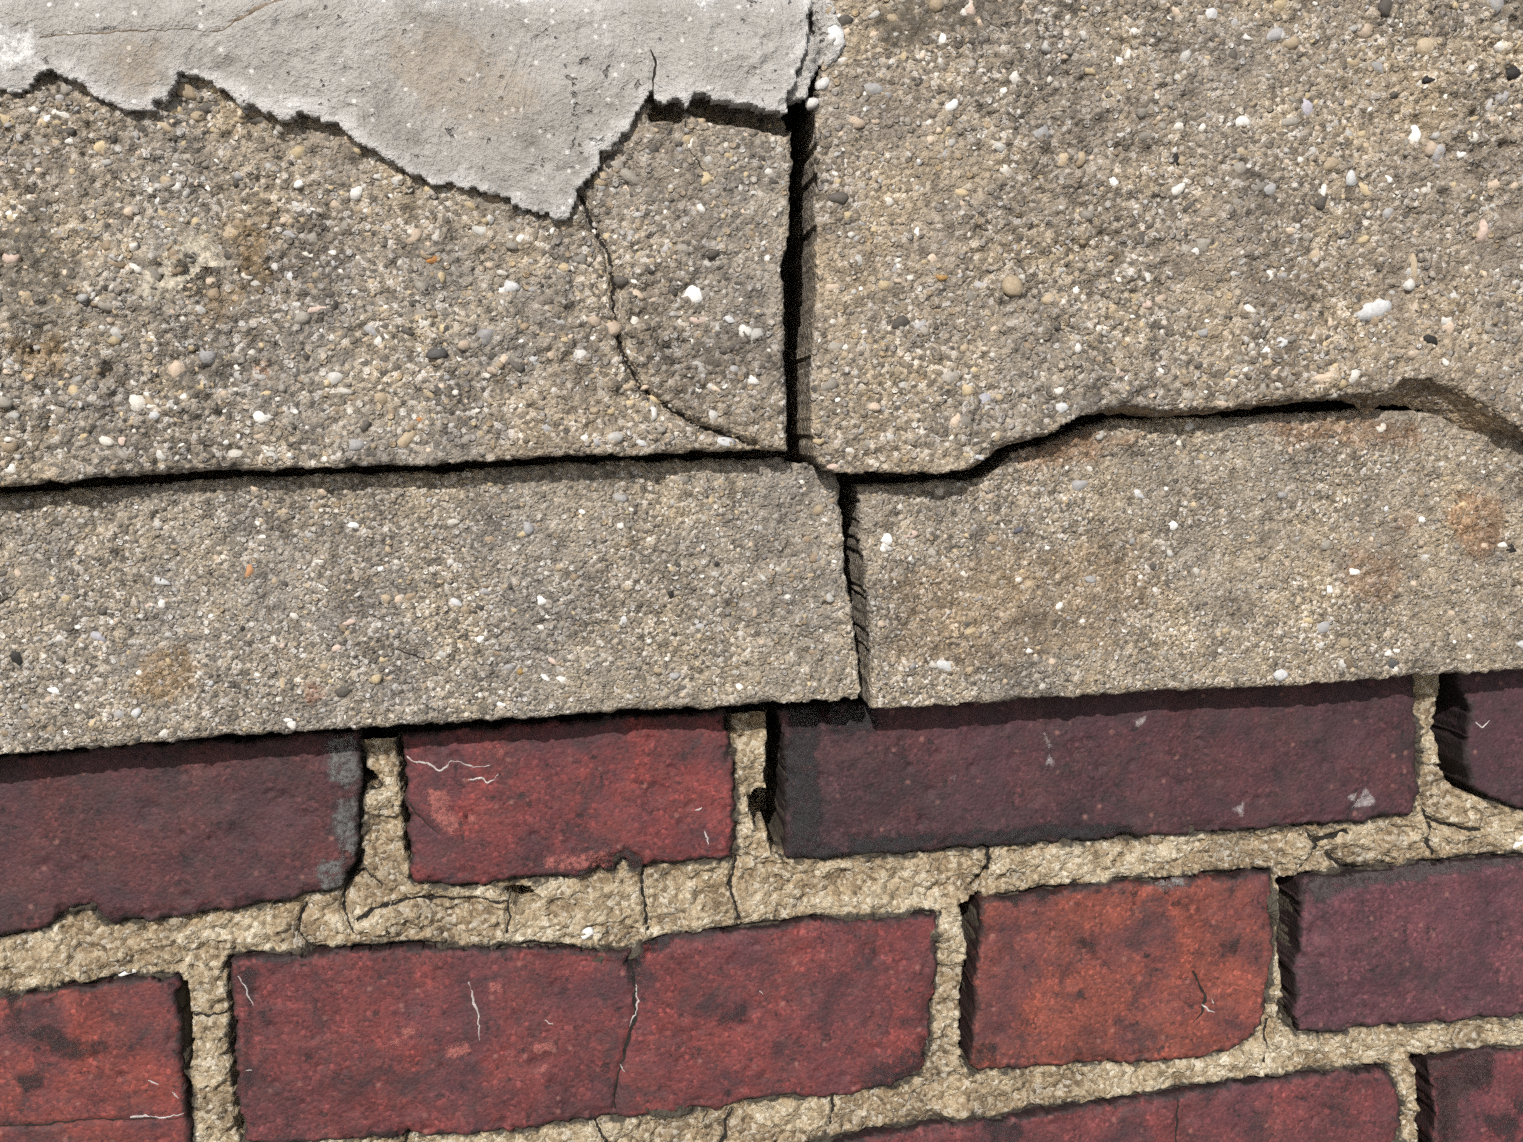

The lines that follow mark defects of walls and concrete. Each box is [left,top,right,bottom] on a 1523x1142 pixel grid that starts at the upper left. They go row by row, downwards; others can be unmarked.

peeling [0,0,812,221]
crack [578,195,753,446]
spalling [1090,378,1523,441]
crack [265,586,285,726]
crack [396,649,438,670]
leakage [317,735,361,890]
crack [593,865,649,1142]